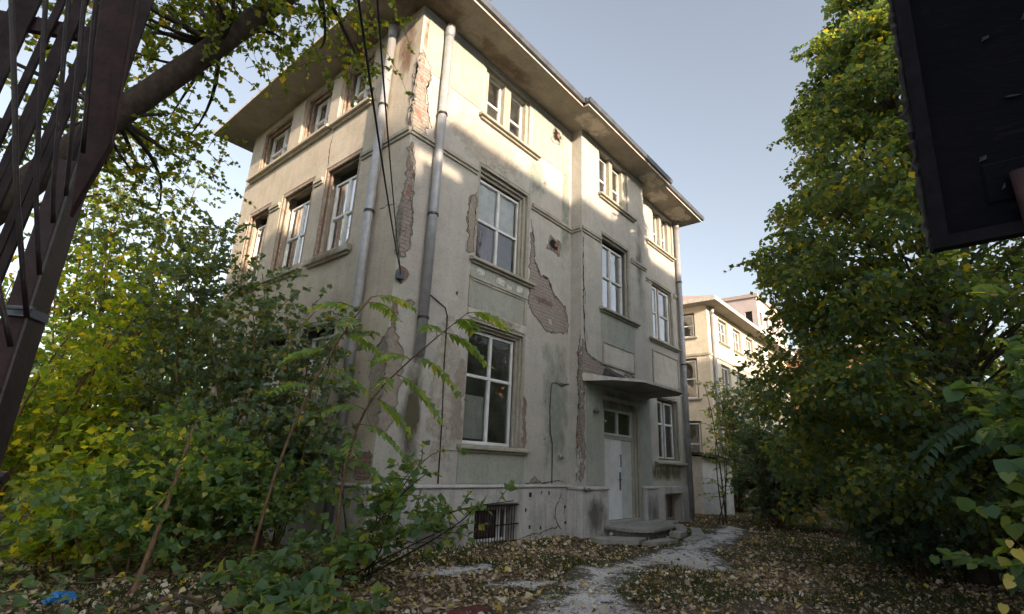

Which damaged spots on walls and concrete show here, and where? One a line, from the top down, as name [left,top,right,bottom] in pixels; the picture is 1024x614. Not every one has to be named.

peeling [407,49,433,134]
spalling [550,125,563,149]
peeling [394,141,416,283]
peeling [466,193,478,253]
peeling [476,222,569,334]
peeling [366,299,415,432]
spalling [575,338,607,492]